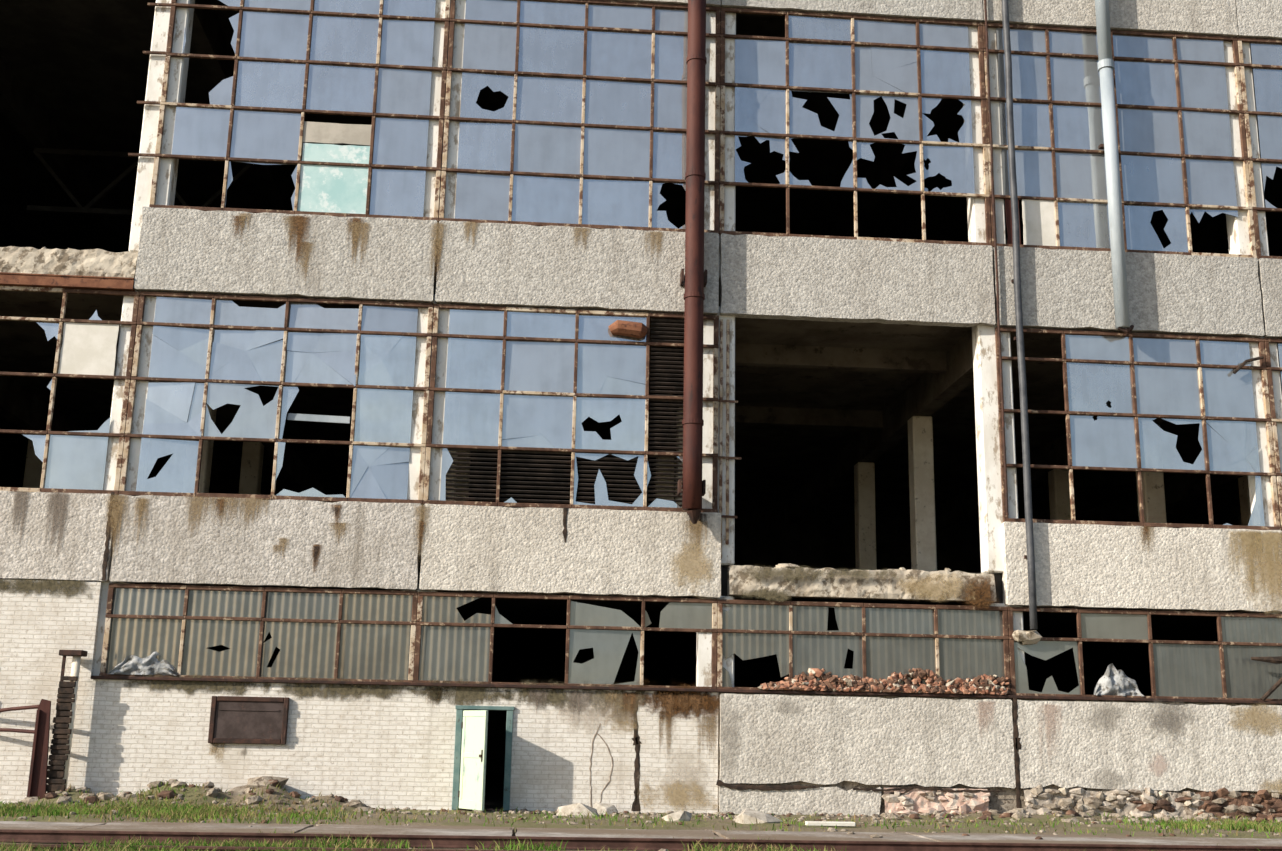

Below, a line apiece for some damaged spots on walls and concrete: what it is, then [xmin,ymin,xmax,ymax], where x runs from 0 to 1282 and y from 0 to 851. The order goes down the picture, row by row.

spalling [0,246,138,279]
rust [285,215,312,273]
rust [348,218,369,258]
rust [108,495,148,544]
rust [189,497,268,528]
rust [333,504,346,541]
spalling [728,563,997,602]
leakage [1231,531,1282,598]
crack [589,690,641,811]
leakage [642,783,705,807]
spalling [882,787,991,815]
spalling [1024,784,1282,822]